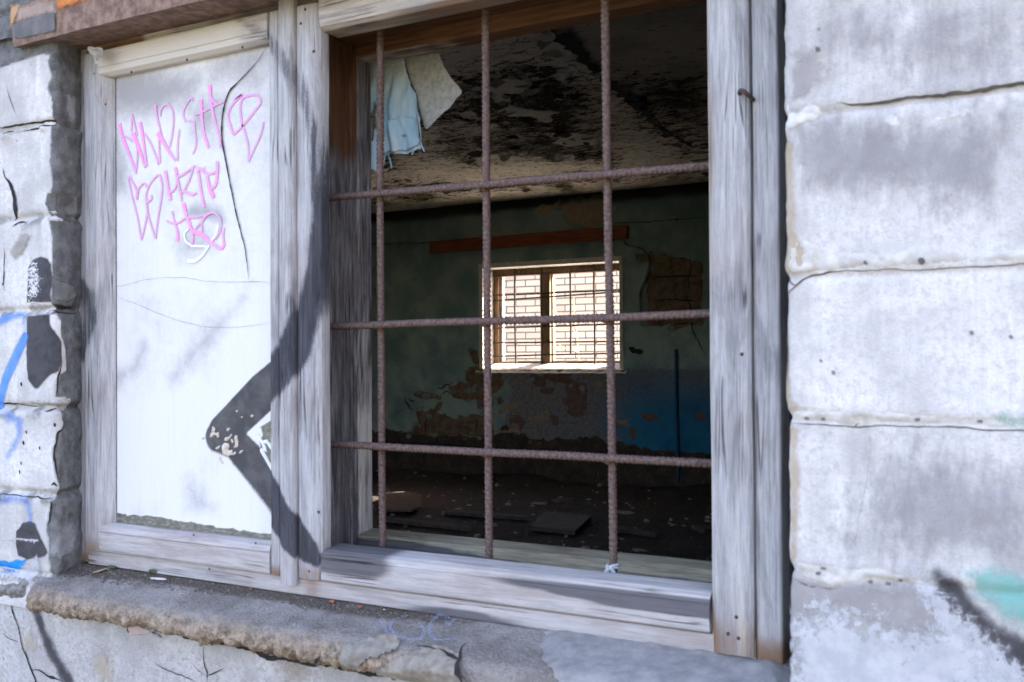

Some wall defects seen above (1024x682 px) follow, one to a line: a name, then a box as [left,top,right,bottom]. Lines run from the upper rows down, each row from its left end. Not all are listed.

leakage [371,182,709,220]
peeling [635,250,707,331]
peeling [372,348,712,487]
crack [2,605,63,682]
spalling [127,626,161,637]
crack [158,636,382,680]
leakage [791,582,945,632]